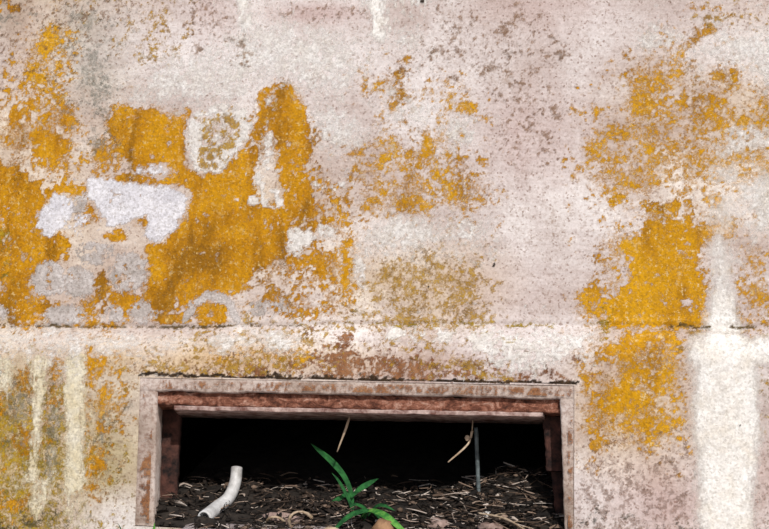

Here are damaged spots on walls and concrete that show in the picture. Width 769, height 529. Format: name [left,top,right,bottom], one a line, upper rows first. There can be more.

peeling [36,192,88,242]
peeling [87,164,188,242]